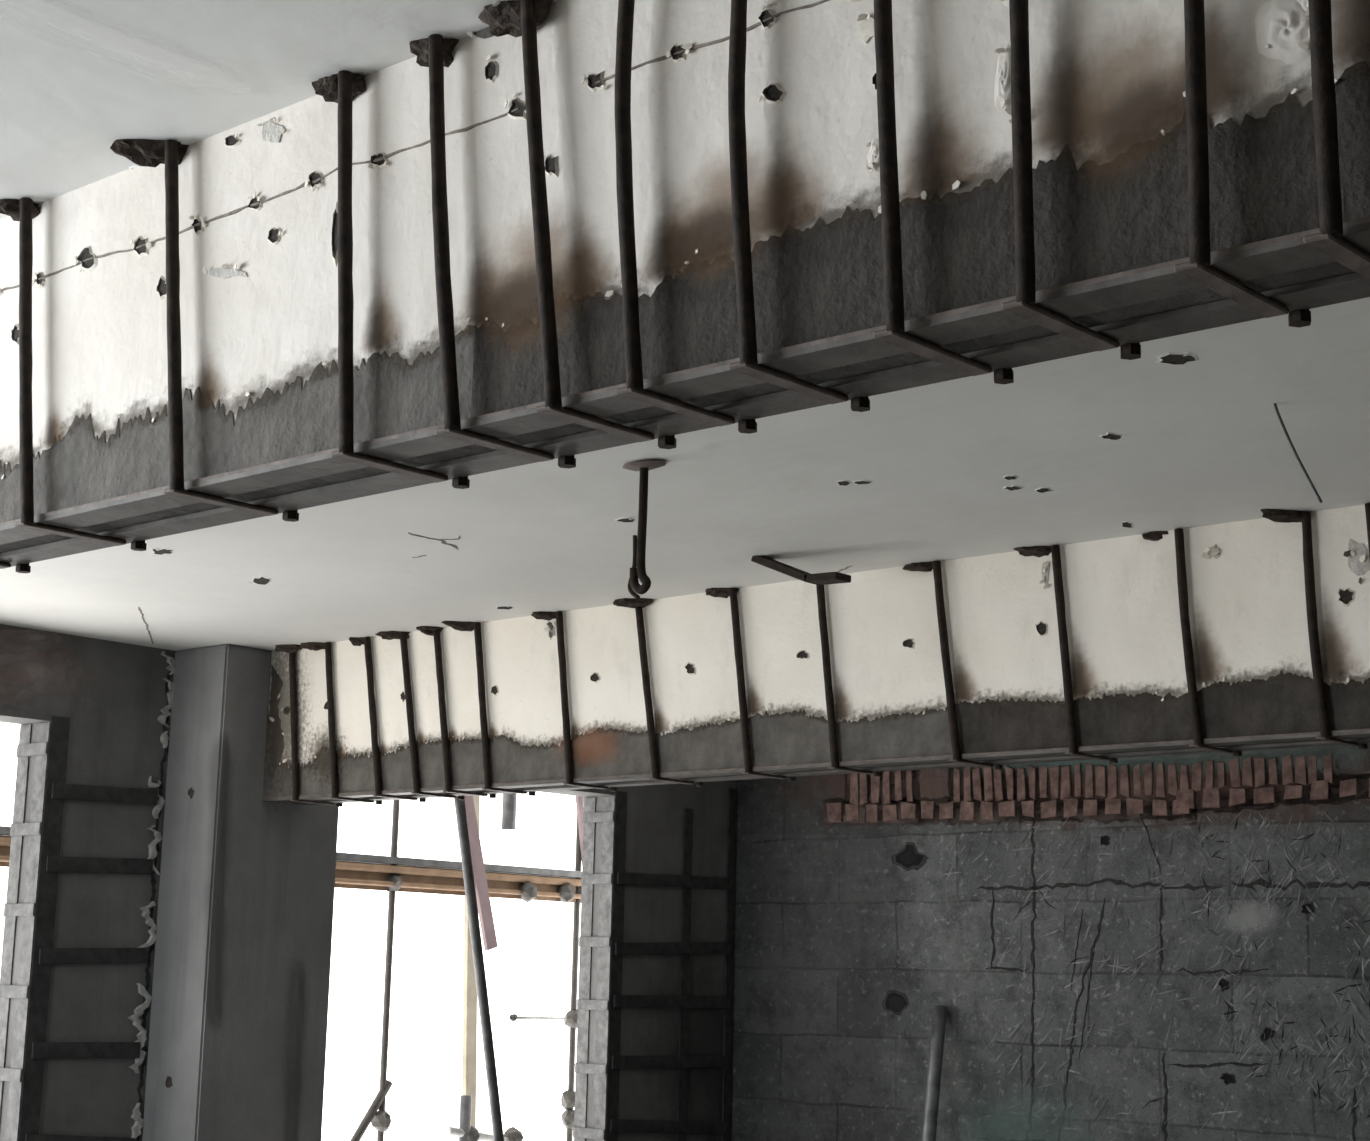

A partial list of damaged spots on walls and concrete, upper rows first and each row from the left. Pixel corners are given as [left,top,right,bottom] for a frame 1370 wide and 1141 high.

spalling [225,134,242,148]
spalling [467,27,499,83]
spalling [544,155,559,177]
spalling [758,84,787,105]
peeling [899,160,1016,321]
peeling [1032,91,1190,291]
peeling [1207,78,1320,252]
peeling [1334,61,1370,222]
peeling [0,187,886,523]
spalling [1153,352,1199,365]
flaking render [263,665,1370,871]
crack [977,815,1370,1141]